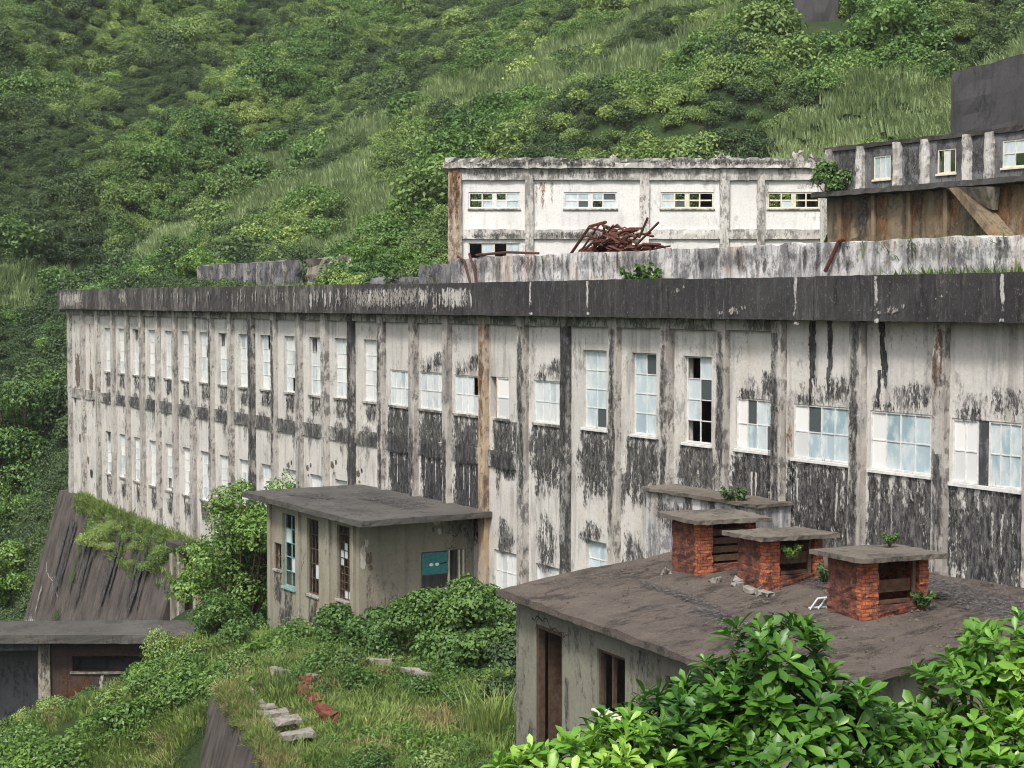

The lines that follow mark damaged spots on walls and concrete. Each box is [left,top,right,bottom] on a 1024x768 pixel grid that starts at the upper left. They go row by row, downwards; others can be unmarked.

rust [449,168,460,241]
damp [103,196,1024,620]